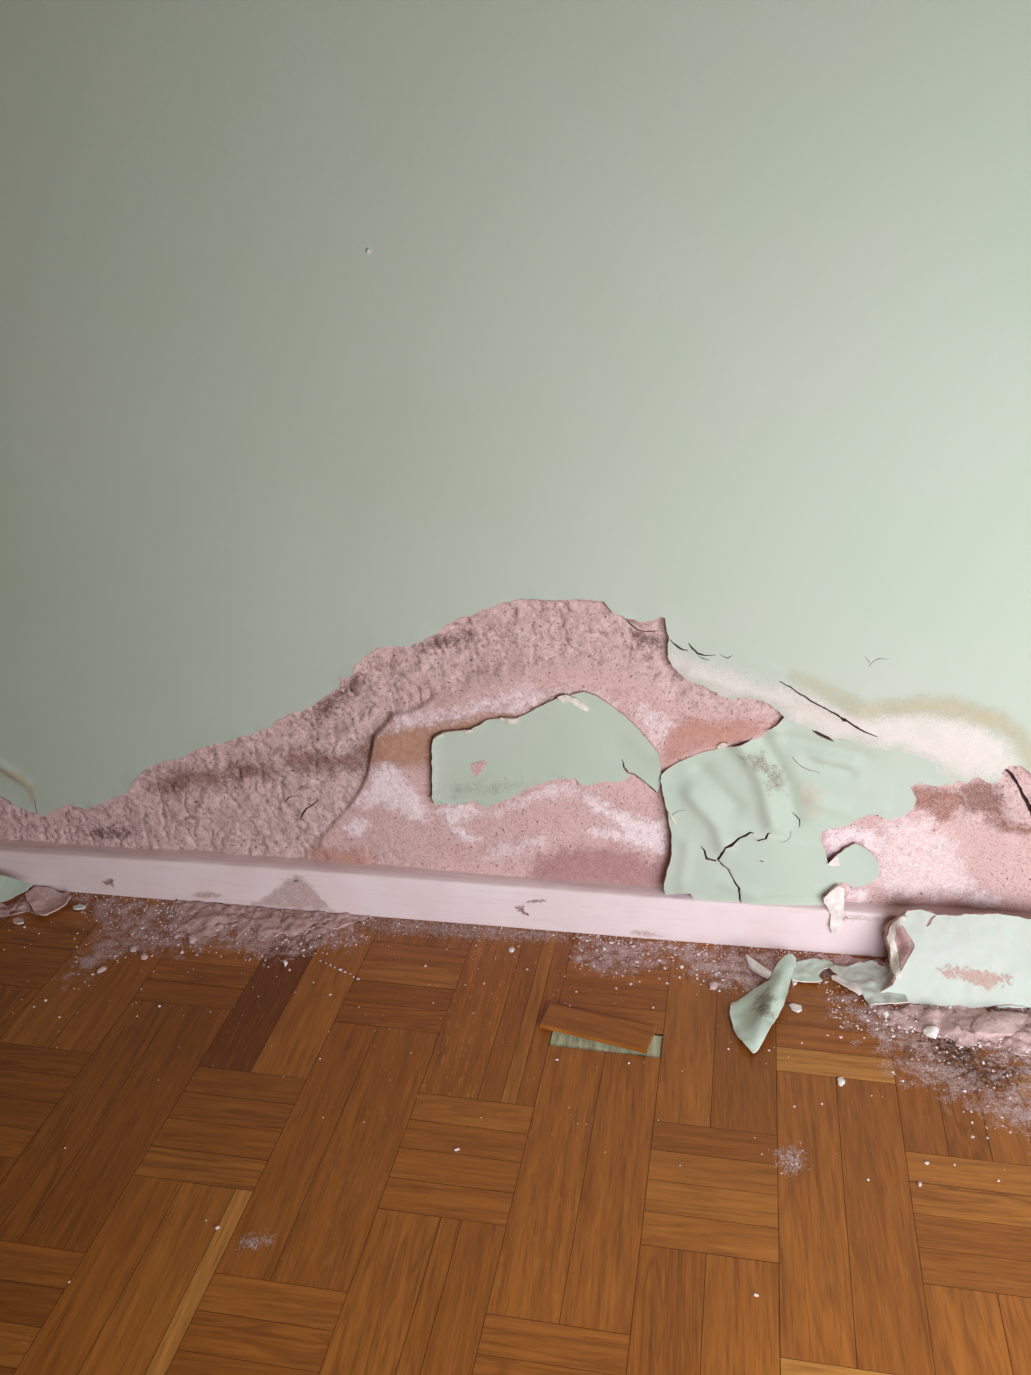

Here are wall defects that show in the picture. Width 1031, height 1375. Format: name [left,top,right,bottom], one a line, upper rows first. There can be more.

flaking render [0,599,784,887]
crack [780,681,875,740]
leakage [629,627,1031,784]
crack [1005,769,1031,815]
peeling [251,874,335,913]
crack [701,815,800,900]
flaking render [821,766,1031,934]
peeling [791,958,909,1006]